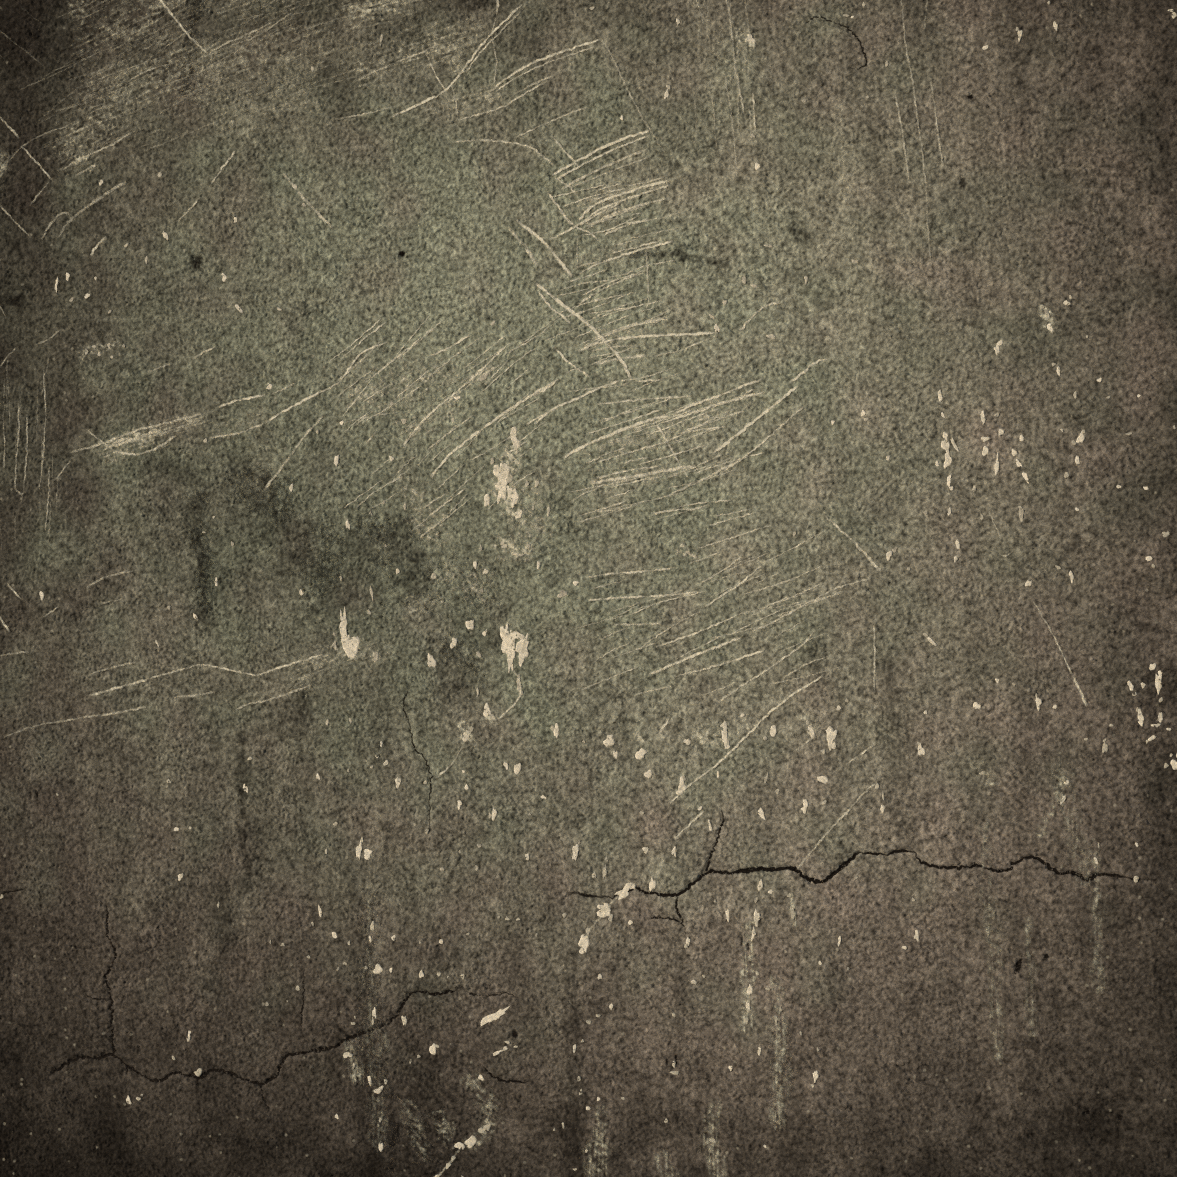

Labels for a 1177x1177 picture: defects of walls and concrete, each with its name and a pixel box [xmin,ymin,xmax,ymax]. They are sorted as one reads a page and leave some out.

crack [572,812,1134,929]
crack [51,911,514,1109]